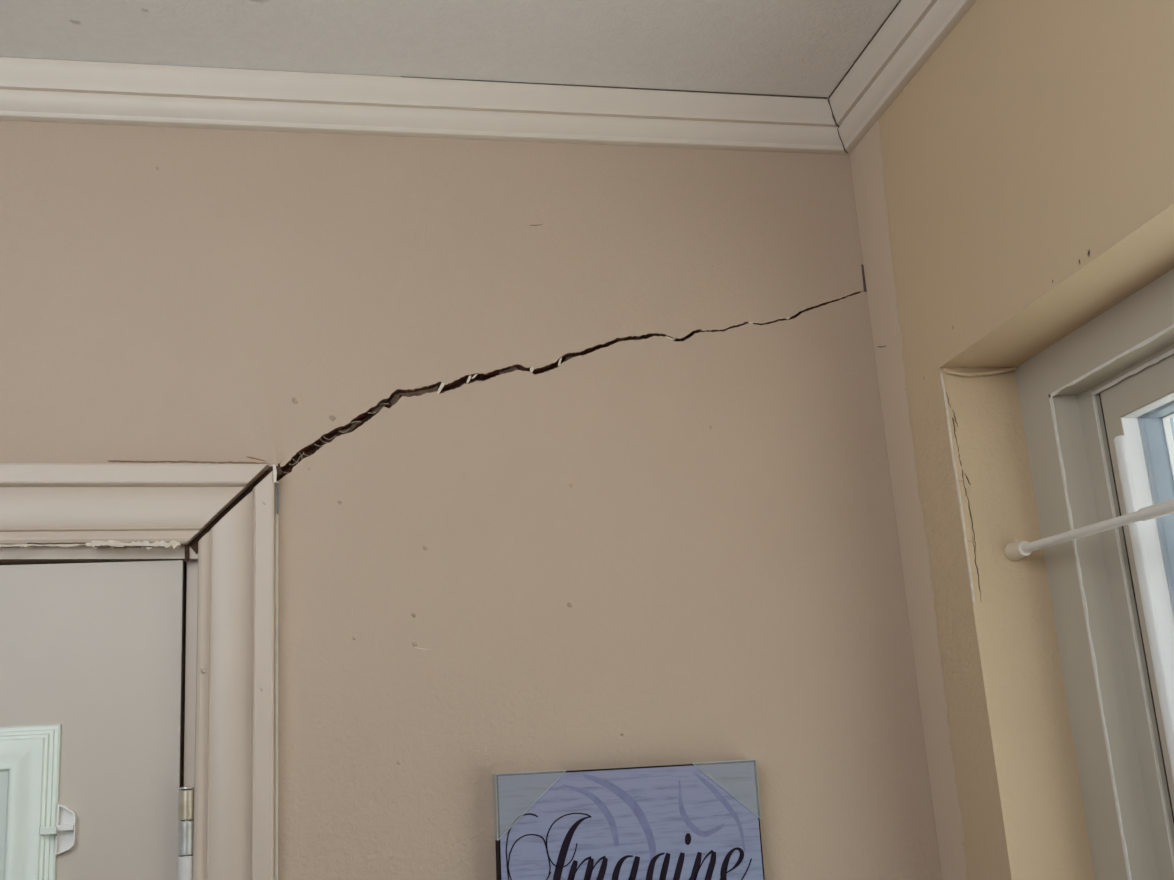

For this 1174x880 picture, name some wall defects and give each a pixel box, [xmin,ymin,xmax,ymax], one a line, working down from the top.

crack [108,265,867,481]